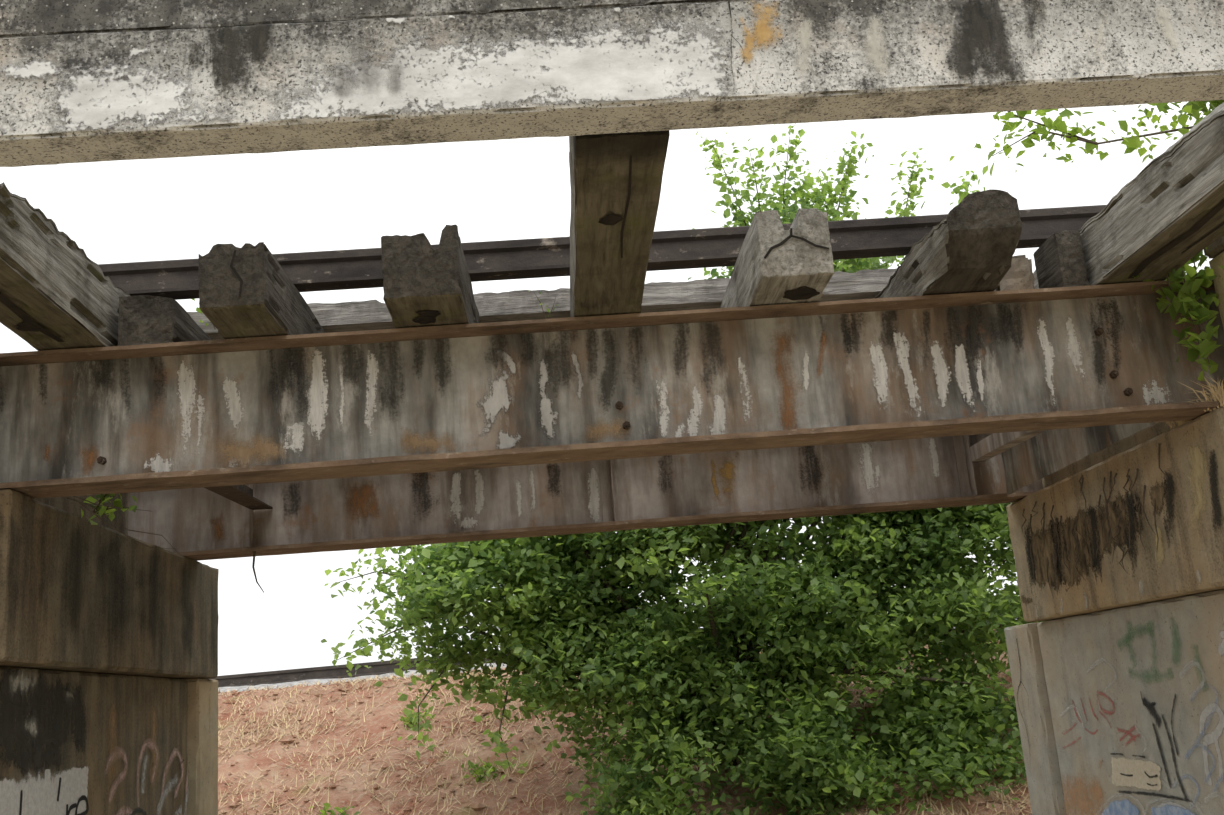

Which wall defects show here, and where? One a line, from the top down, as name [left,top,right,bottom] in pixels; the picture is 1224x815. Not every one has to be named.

damp [184,25,272,97]
corrosion [741,4,782,61]
damp [945,0,1046,82]
damp [269,338,449,452]
damp [521,327,642,406]
damp [656,323,753,437]
corrosion [776,335,797,430]
damp [802,351,810,392]
damp [0,669,87,776]